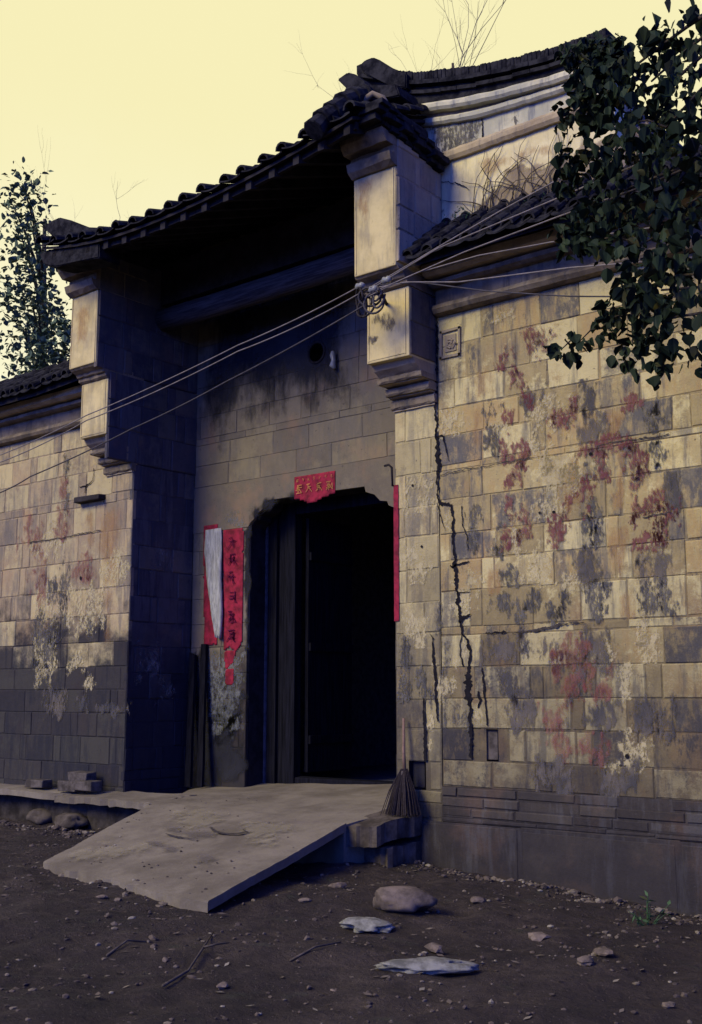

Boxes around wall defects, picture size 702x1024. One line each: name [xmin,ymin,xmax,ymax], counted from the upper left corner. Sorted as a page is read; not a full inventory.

damp [481,400,504,458]
damp [515,382,546,415]
damp [565,378,610,445]
damp [641,398,682,512]
peeling [72,550,130,585]
crack [422,321,584,761]
peeling [34,624,58,686]
flaking render [208,650,244,735]
damp [396,602,473,732]
damp [463,496,680,745]
peeling [538,631,660,766]